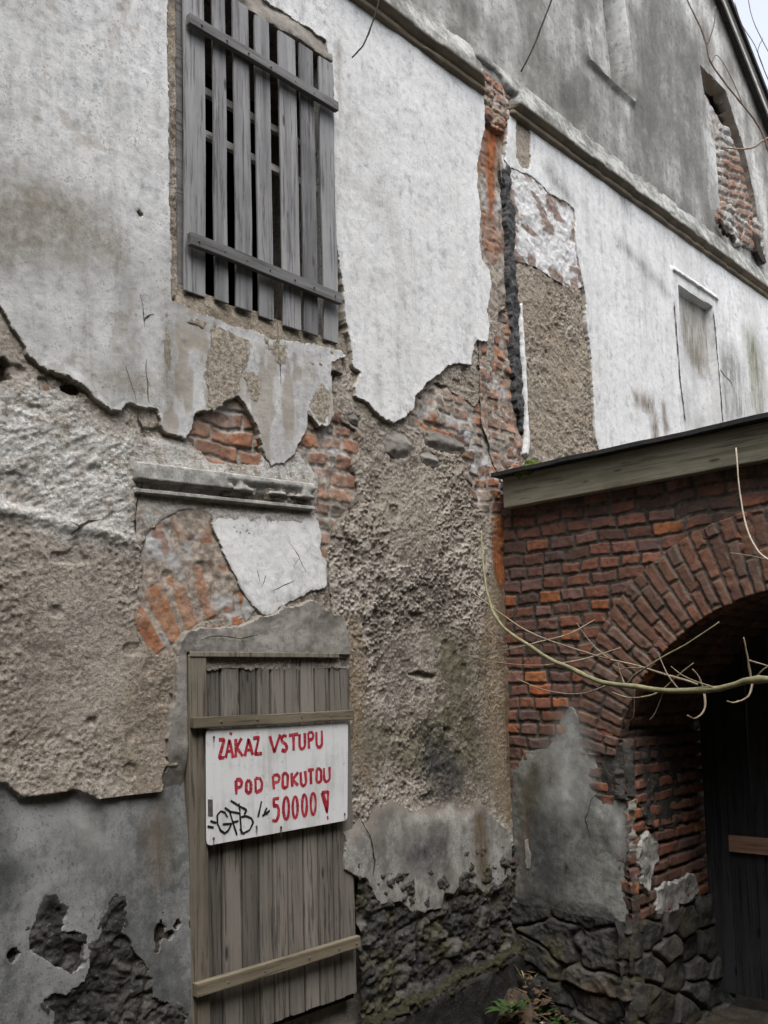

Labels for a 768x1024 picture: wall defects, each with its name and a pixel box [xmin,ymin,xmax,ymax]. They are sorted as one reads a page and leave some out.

spalling [715,201,766,257]
flaking render [0,68,597,1024]
leakage [552,720,585,811]
leakage [611,809,625,855]
peeling [633,830,699,920]